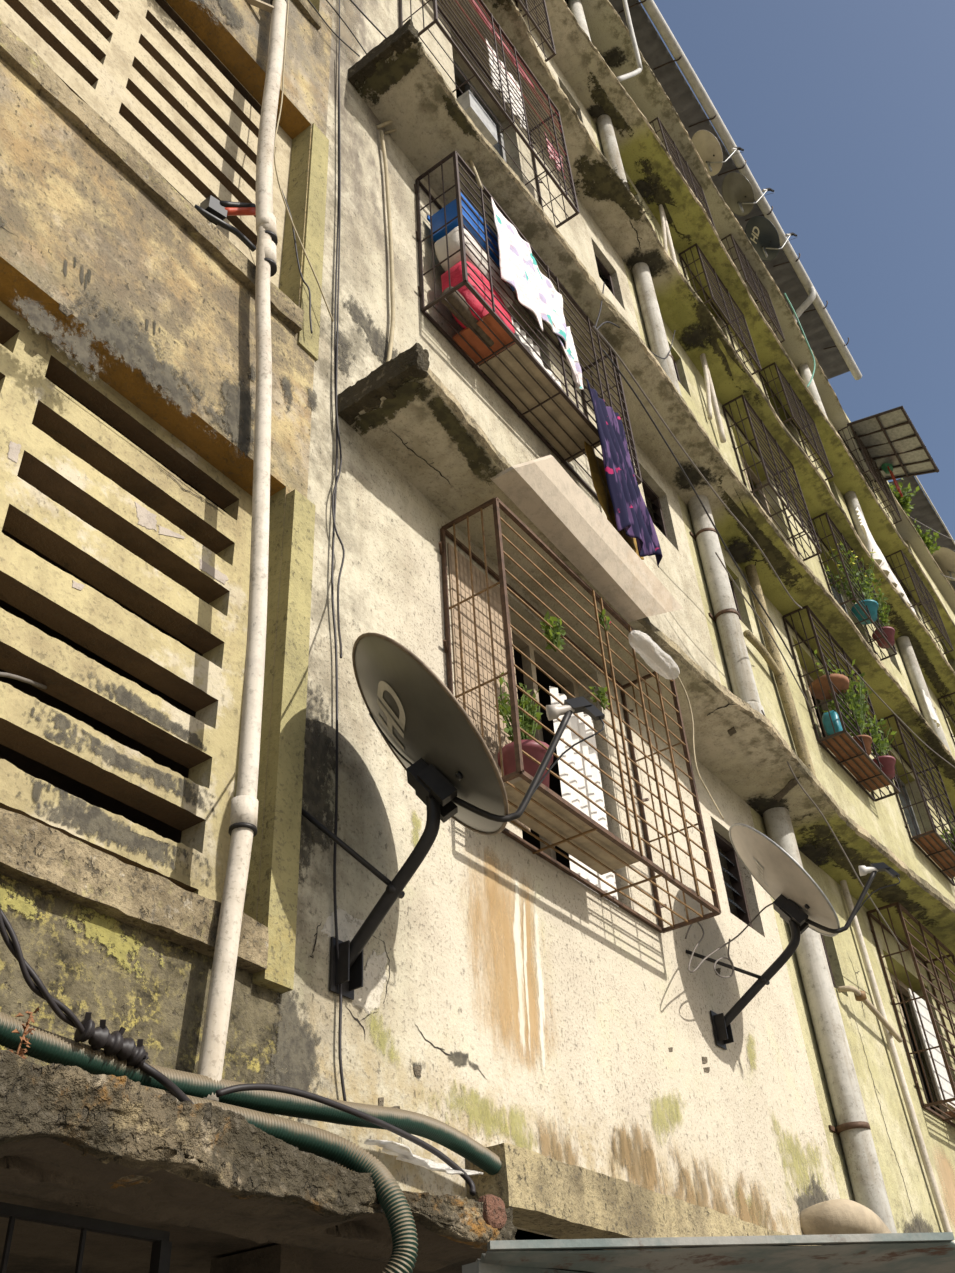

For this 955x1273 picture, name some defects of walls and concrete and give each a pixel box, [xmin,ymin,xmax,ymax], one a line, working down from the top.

damp [635,179,659,204]
crack [389,428,450,484]
crack [345,935,390,1033]
damp [513,882,545,1071]
crack [415,1024,450,1056]
damp [448,1051,479,1070]
damp [539,1121,578,1166]
damp [612,1126,777,1232]